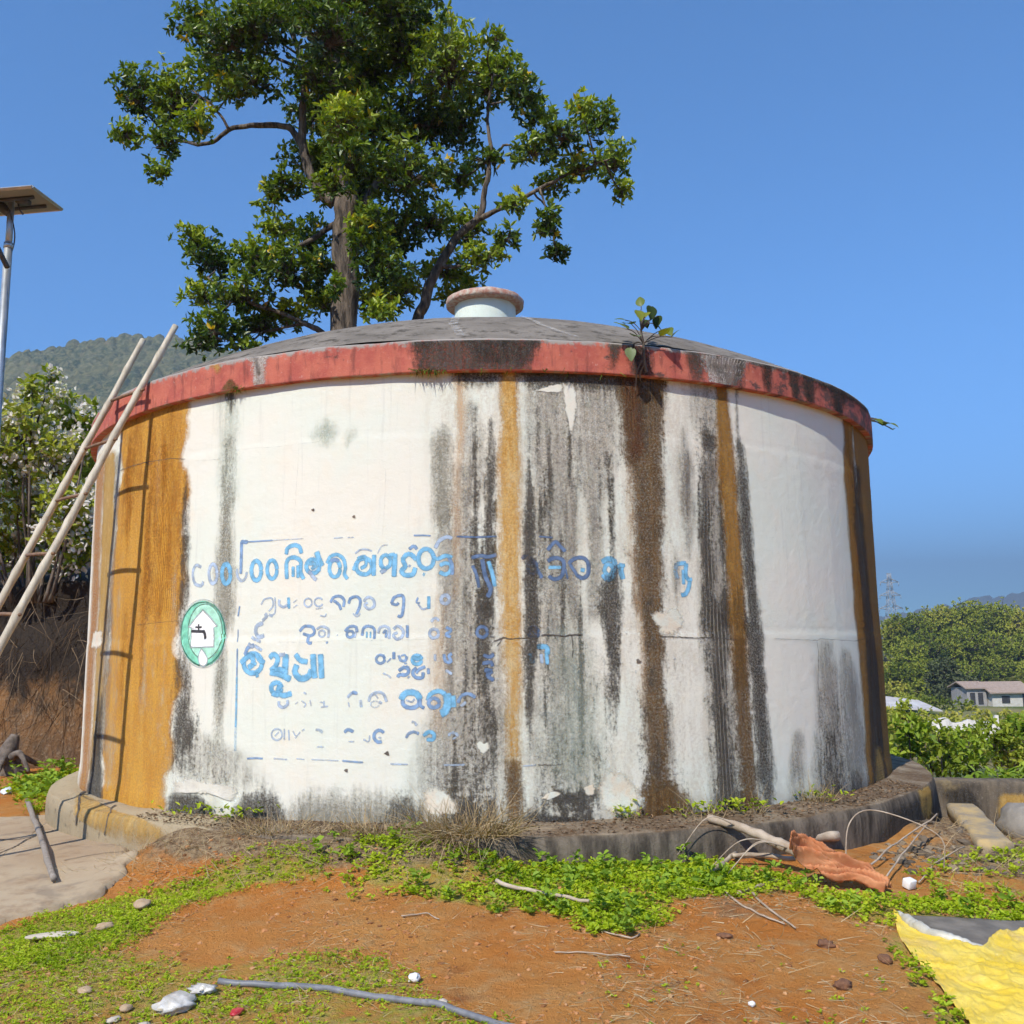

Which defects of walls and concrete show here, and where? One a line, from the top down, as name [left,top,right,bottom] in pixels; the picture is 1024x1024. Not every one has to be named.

rust [74,401,190,840]
leakage [180,488,190,628]
leakage [166,792,213,815]
leakage [172,656,248,783]
leakage [216,471,233,625]
leakage [222,380,237,414]
rust [497,372,524,821]
leakage [412,340,695,824]
peeling [535,383,577,433]
rust [716,387,761,808]
leakage [682,351,870,811]
rust [843,420,892,786]